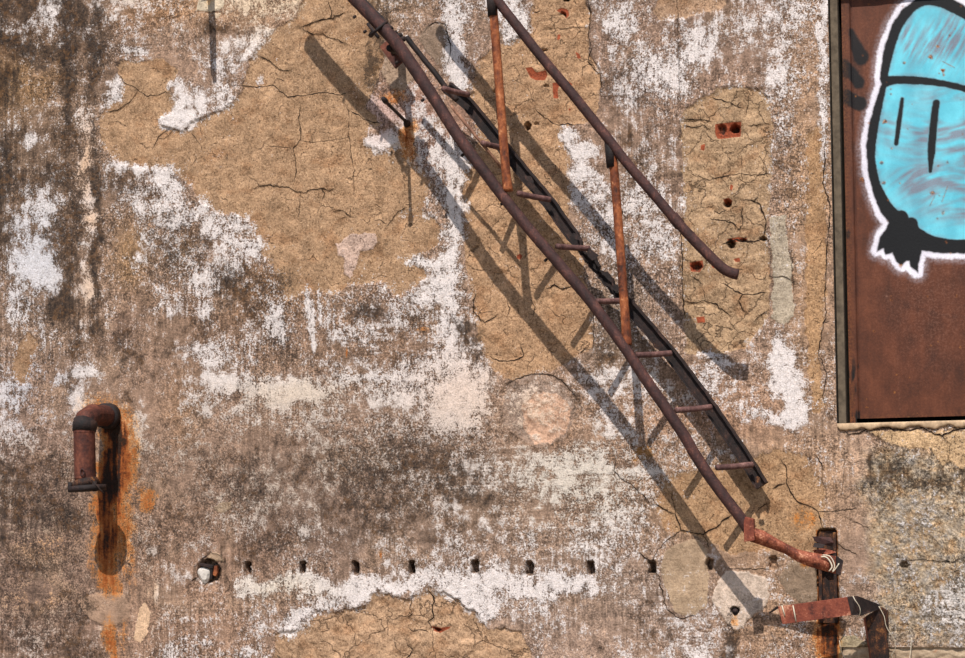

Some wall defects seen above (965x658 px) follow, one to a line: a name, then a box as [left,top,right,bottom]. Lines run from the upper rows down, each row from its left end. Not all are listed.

leakage [0,0,107,393]
peeling [71,362,99,381]
spalling [77,0,602,441]
spalling [650,0,836,558]
corrosion [67,387,162,658]
spalling [228,558,600,658]
corrosion [803,617,849,658]